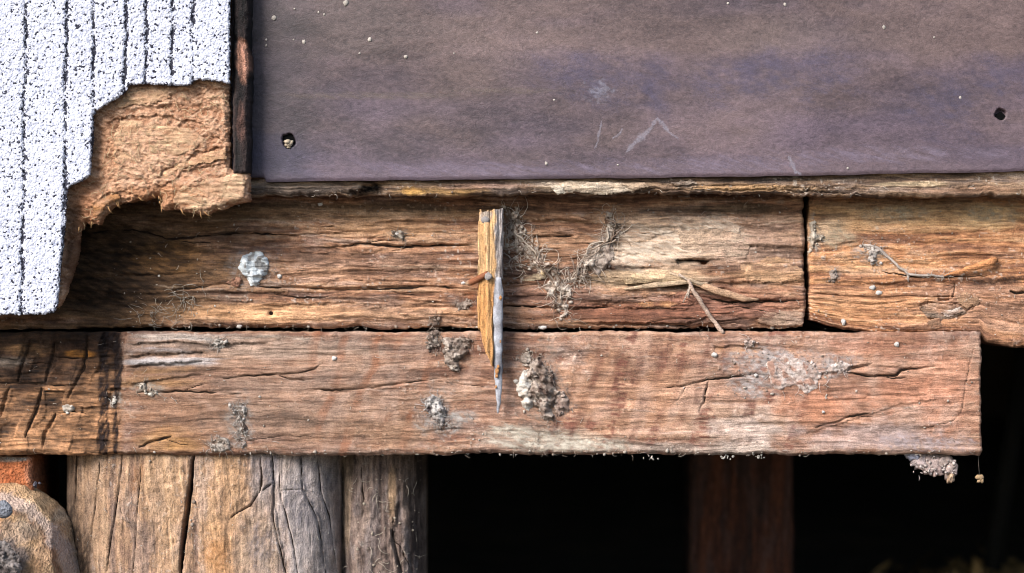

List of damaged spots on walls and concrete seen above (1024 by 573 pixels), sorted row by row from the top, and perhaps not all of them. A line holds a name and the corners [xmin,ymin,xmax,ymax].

spalling [57,0,252,309]
crack [0,334,93,437]
crack [667,374,753,405]
crack [847,366,918,379]
crack [229,435,335,573]